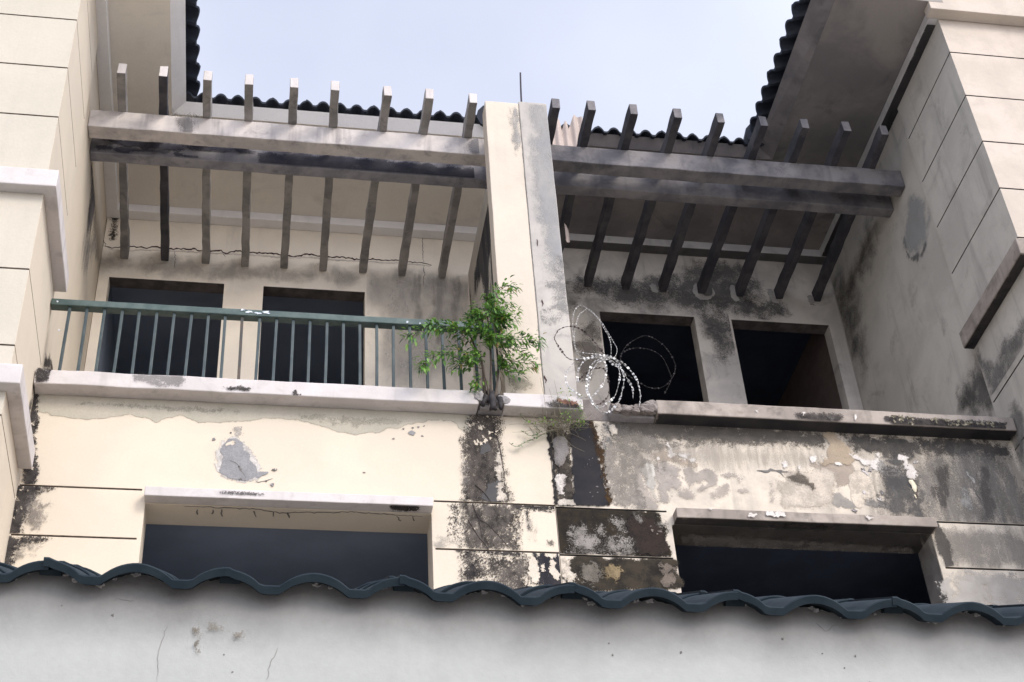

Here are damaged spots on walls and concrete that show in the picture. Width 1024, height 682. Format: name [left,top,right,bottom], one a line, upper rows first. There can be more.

water stain [881,24,936,132]
water stain [82,165,120,268]
crack [103,238,432,285]
water stain [508,104,843,362]
water stain [572,319,603,381]
peeling [212,426,277,496]
crack [184,506,422,521]
water stain [0,354,1024,640]
peeling [657,442,696,462]
peeling [748,432,884,520]
peeling [897,455,918,500]